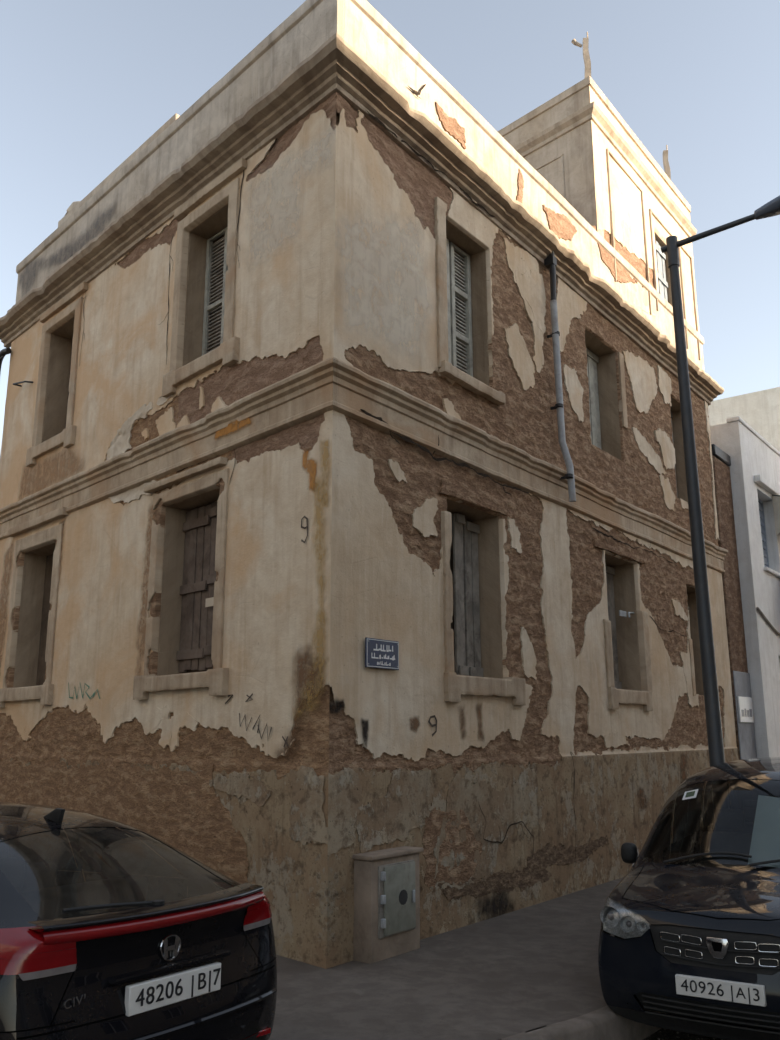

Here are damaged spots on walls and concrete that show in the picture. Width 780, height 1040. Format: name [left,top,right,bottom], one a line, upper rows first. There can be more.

water stain [20,210,112,292]
crack [159,234,174,365]
spalling [247,92,453,239]
peeling [435,102,466,150]
peeling [542,204,577,241]
spalling [106,336,324,460]
spalling [344,225,719,546]
rust [302,450,317,490]
spalling [0,414,609,901]
spalling [566,510,708,756]